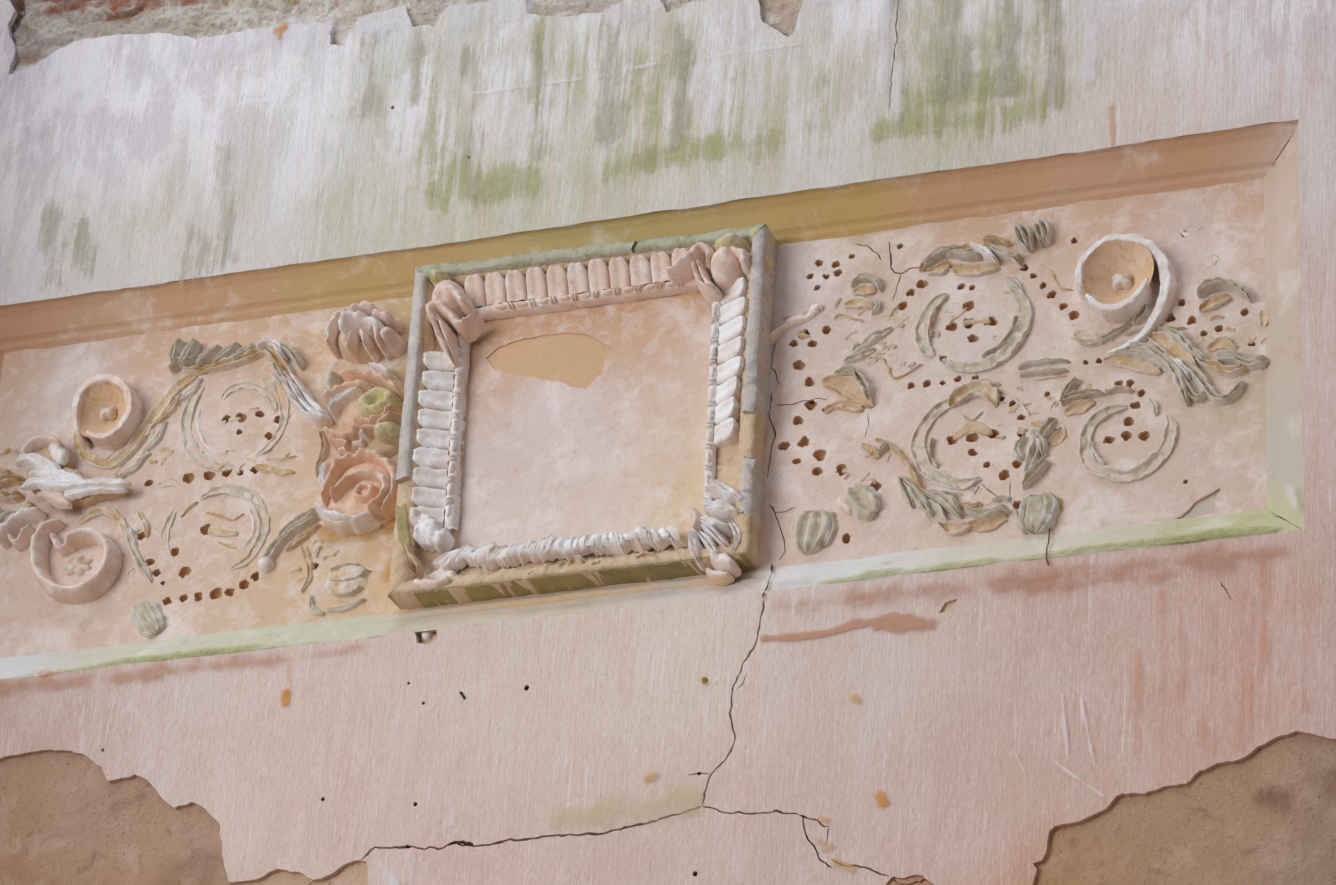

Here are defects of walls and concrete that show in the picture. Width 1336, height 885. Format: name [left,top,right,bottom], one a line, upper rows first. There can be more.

spalling [11,0,489,74]
leakage [410,29,425,104]
spalling [527,0,623,17]
leakage [671,28,694,149]
spalling [759,0,804,37]
peeling [487,333,612,389]
crack [751,508,785,653]
peeling [0,752,369,885]
crack [397,840,527,850]
crack [777,811,924,884]
peeling [888,876,933,885]
peeling [1035,734,1336,885]